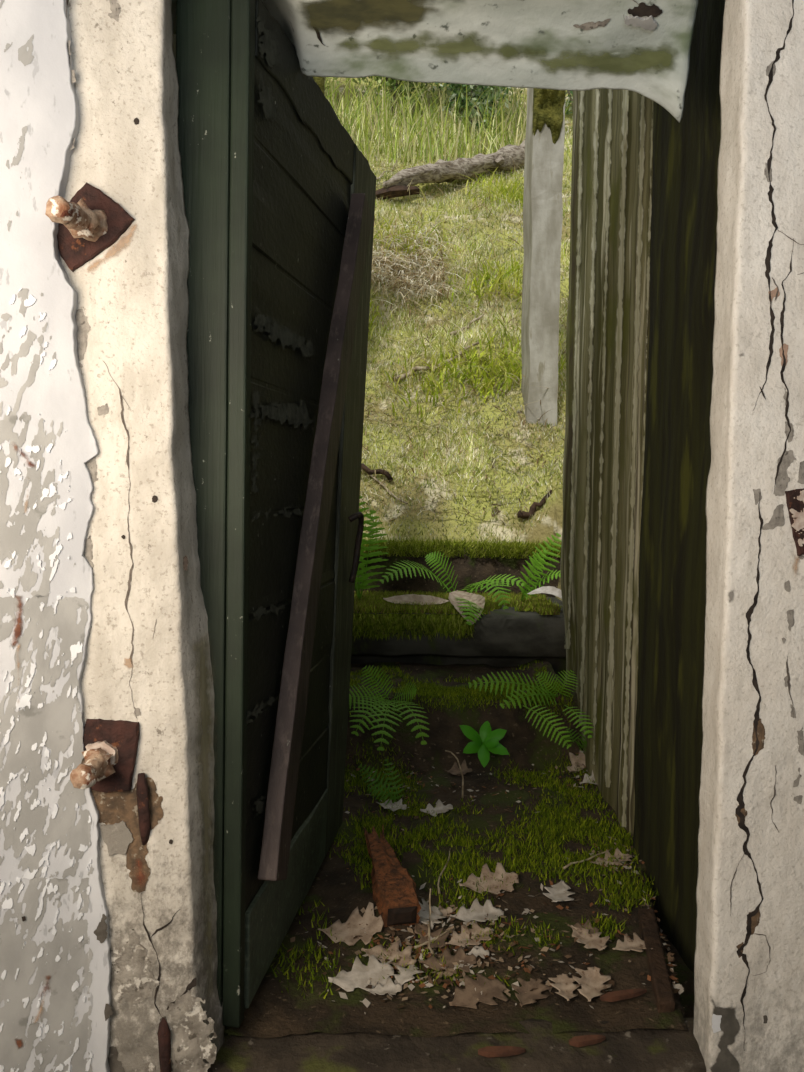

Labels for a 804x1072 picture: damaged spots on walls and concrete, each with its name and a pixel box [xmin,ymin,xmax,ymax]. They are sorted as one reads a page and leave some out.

peeling [4,34,34,66]
damp [302,0,675,74]
spalling [573,2,662,31]
peeling [6,126,28,179]
rust [88,226,136,270]
damp [564,89,653,827]
crack [103,361,157,718]
crack [730,0,804,1051]
peeling [0,288,163,1072]
crack [139,898,196,1017]
peeling [108,990,217,1072]
peeling [712,1014,722,1033]